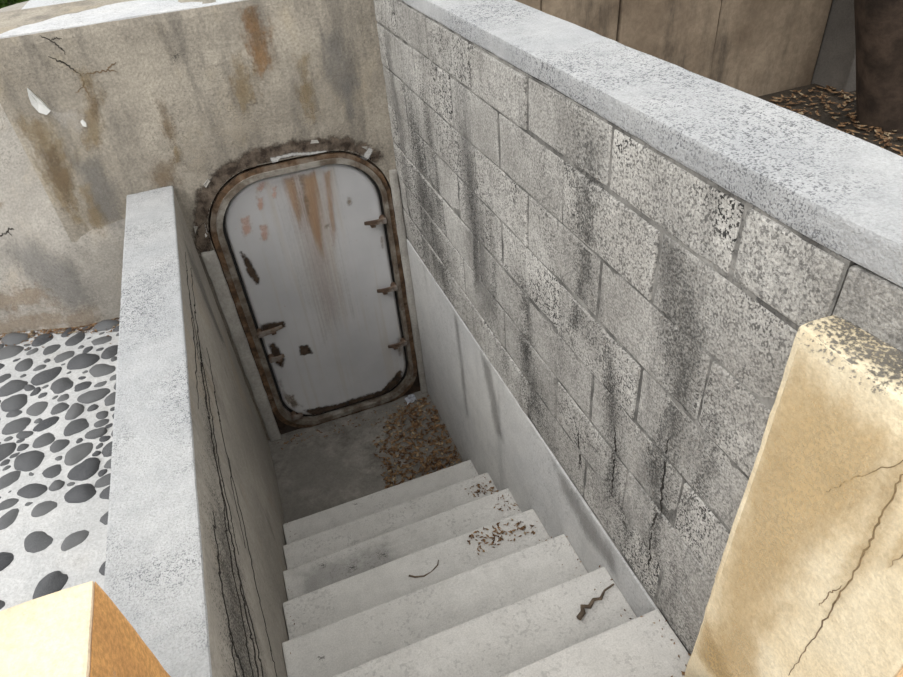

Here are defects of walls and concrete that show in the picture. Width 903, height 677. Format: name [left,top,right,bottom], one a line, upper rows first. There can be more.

rust [245,8,271,73]
crack [40,35,117,97]
peeling [27,88,51,115]
rust [240,252,260,283]
rust [261,321,285,331]
rust [269,343,284,367]
rust [306,370,402,415]
crack [185,252,277,677]
crack [789,460,903,675]